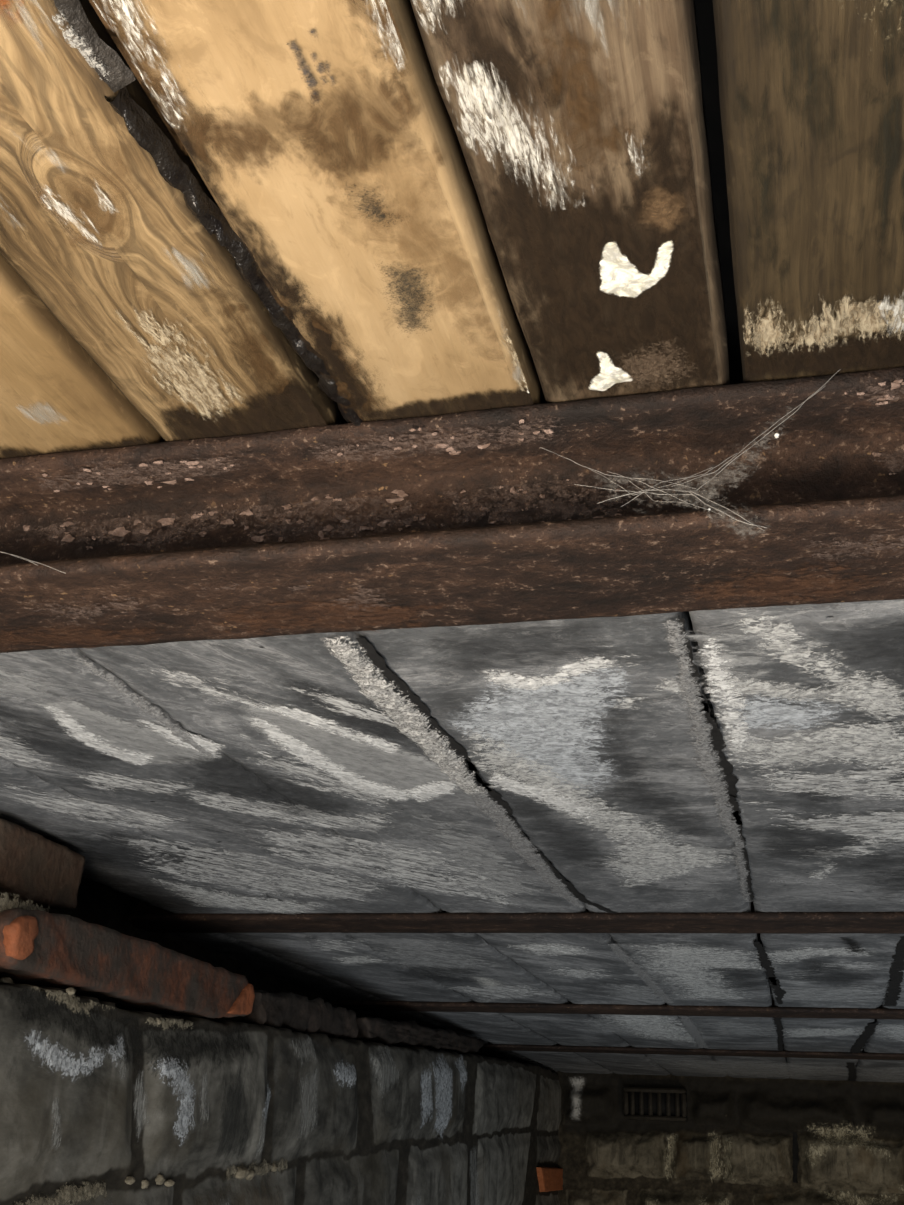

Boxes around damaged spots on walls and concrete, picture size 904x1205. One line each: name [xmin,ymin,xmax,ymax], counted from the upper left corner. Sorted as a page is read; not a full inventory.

damp [89,0,718,441]
corrosion [41,455,240,492]
corrosion [22,479,622,550]
corrosion [316,417,556,463]
damp [744,328,904,379]
corrosion [844,379,904,407]
damp [0,667,542,914]
crack [356,638,616,913]
damp [435,627,732,887]
crack [677,618,755,902]
crack [753,942,786,1051]
crack [846,937,904,1081]